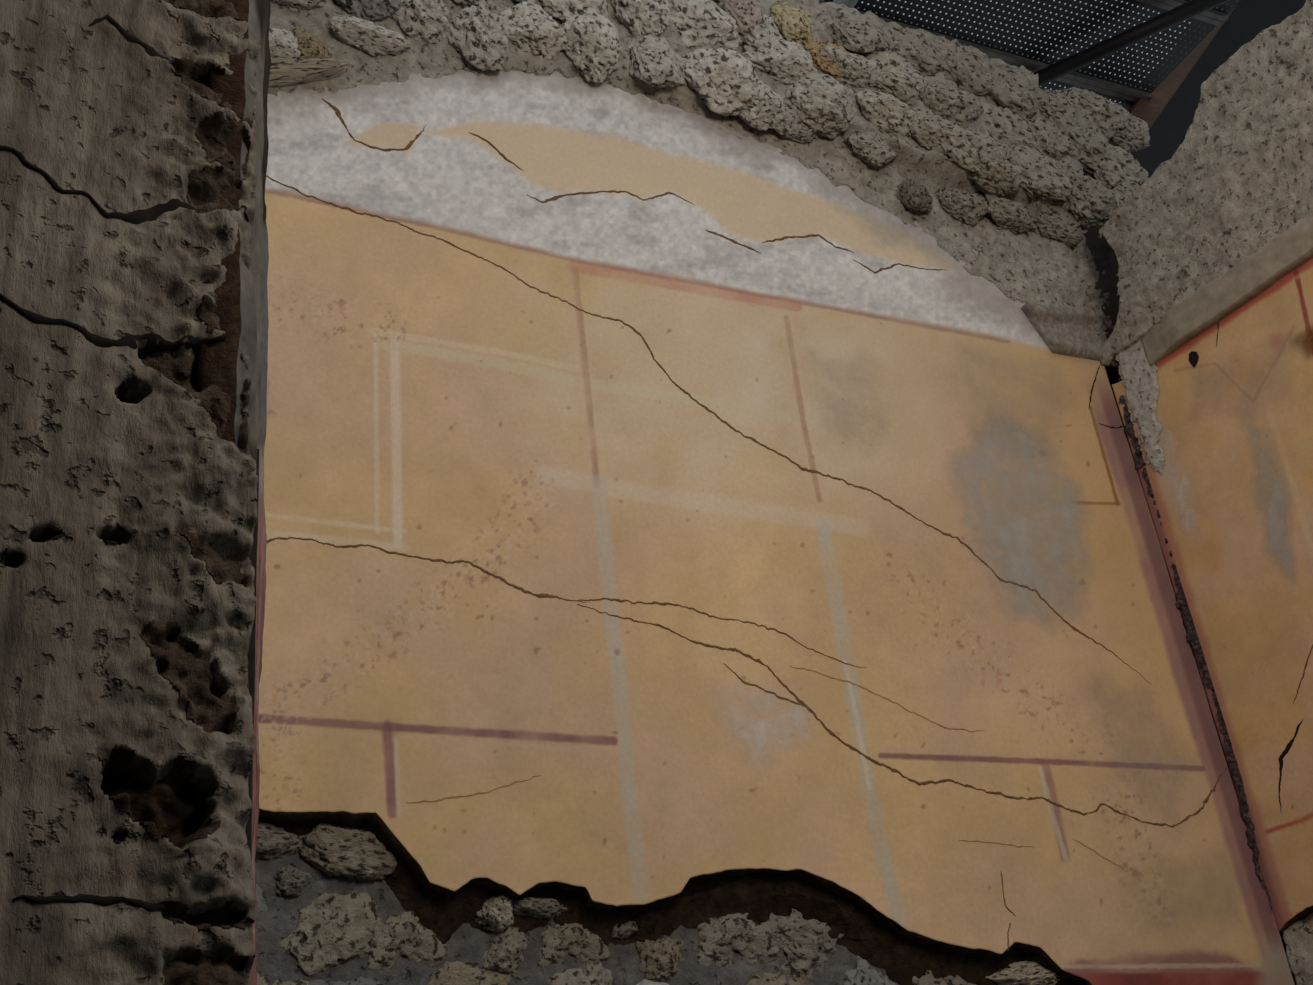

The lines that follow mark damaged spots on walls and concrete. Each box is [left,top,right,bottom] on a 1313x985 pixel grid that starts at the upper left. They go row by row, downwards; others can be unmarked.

crack [89,14,188,86]
crack [0,145,196,224]
crack [469,132,945,274]
crack [0,293,227,359]
flaking render [1116,339,1165,475]
crack [245,175,1313,912]
leakage [960,422,1078,614]
crack [13,893,255,927]
spalling [160,817,1079,985]
spalling [1283,912,1313,985]